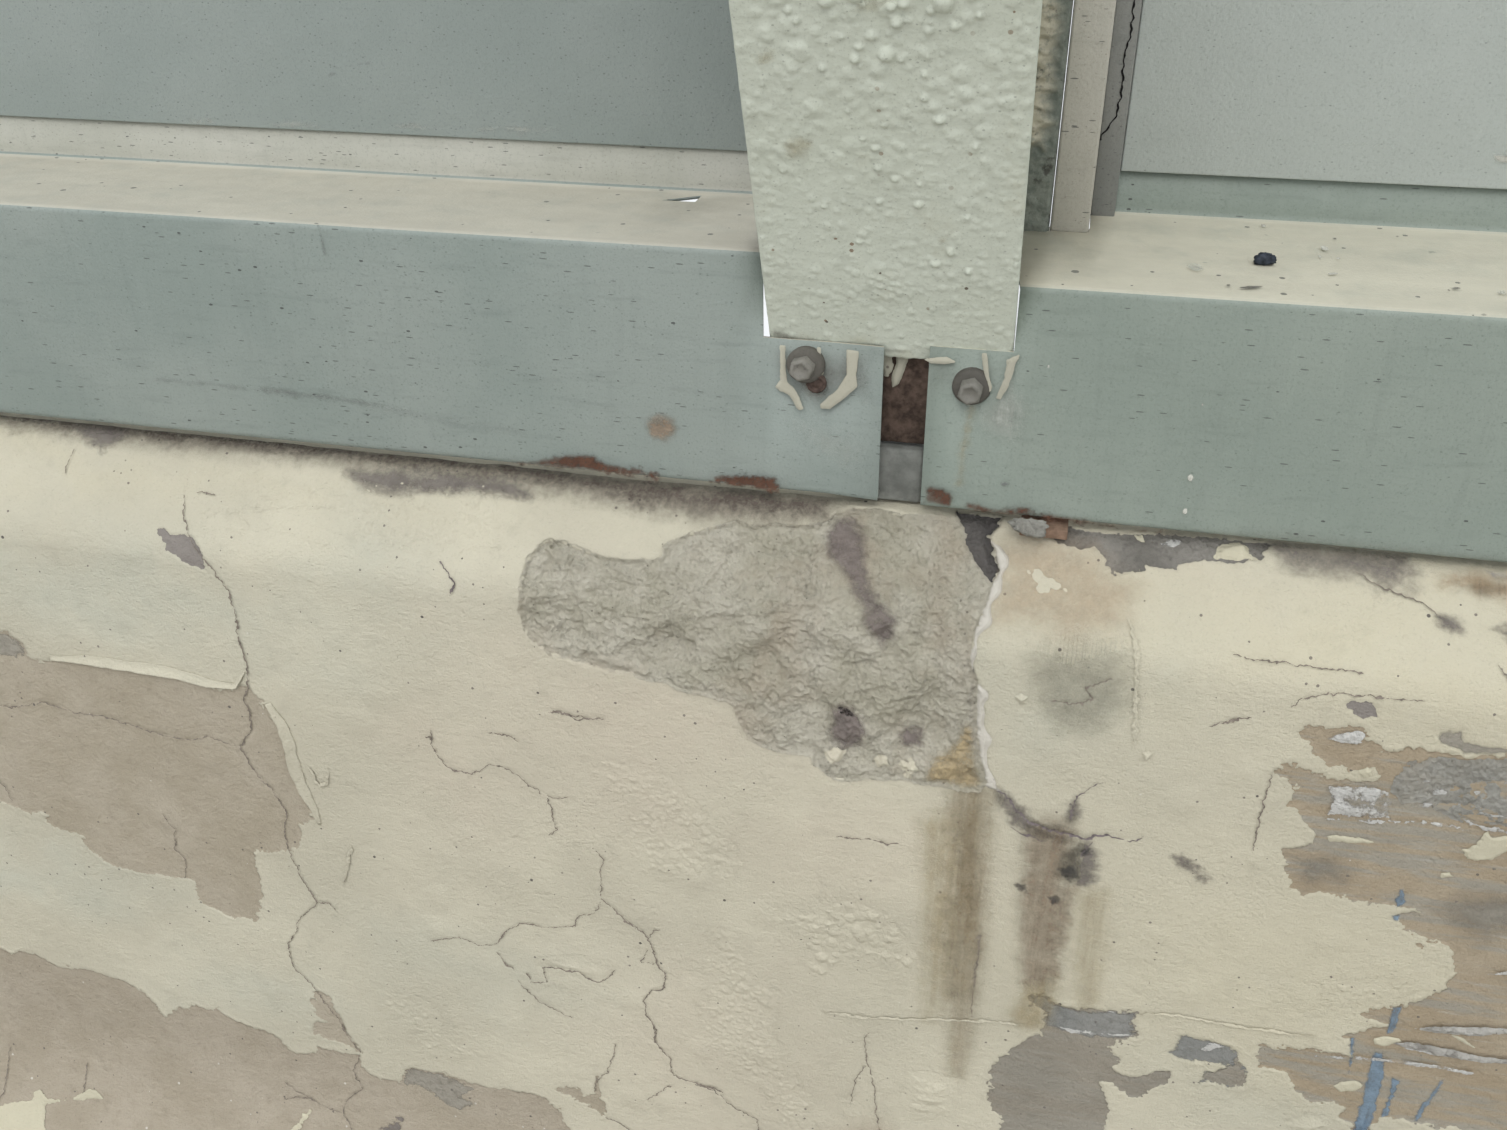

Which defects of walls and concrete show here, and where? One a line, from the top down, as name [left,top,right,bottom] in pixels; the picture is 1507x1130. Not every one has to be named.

peeling [0,631,321,922]
crack [0,491,363,1130]
peeling [0,949,607,1130]
crack [439,561,455,594]
crack [425,732,567,835]
crack [548,710,603,721]
crack [432,848,759,1130]
spalling [517,507,1009,795]
crack [851,1030,879,1127]
crack [838,836,898,846]
damp [996,794,1097,885]
peeling [986,701,1507,1130]